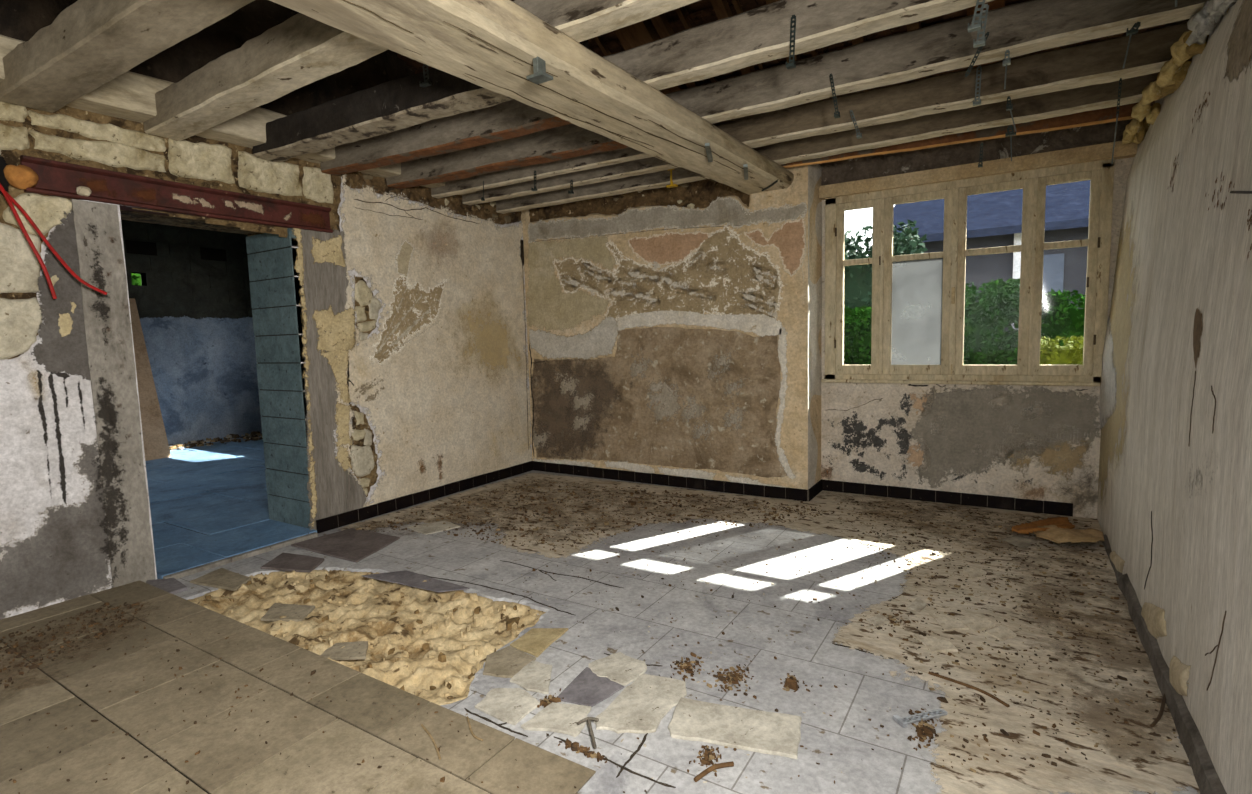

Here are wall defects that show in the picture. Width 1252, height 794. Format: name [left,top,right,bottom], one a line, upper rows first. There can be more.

spalling [0,156,10,196]
peeling [58,302,76,337]
damp [32,370,129,580]
damp [86,224,110,342]
spalling [292,228,367,530]
flaking render [341,171,808,488]
peeling [825,392,930,481]